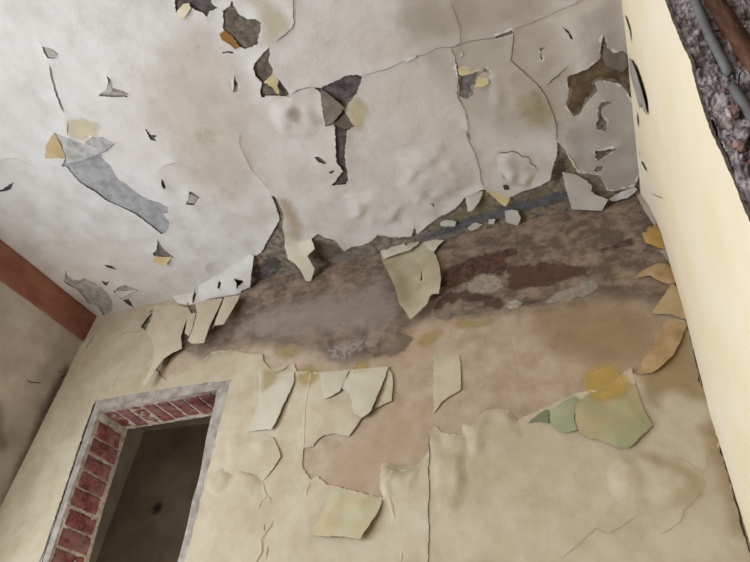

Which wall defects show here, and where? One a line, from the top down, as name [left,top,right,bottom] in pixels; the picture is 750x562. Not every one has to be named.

peeling [175,0,261,54]
peeling [253,48,289,97]
peeling [313,75,362,185]
peeling [456,64,489,99]
crack [367,0,582,188]
peeling [566,35,647,116]
crack [632,60,647,123]
peeling [45,133,174,267]
peeling [64,270,137,314]
peeling [139,142,687,539]
leakage [186,196,675,370]
crack [425,443,433,562]